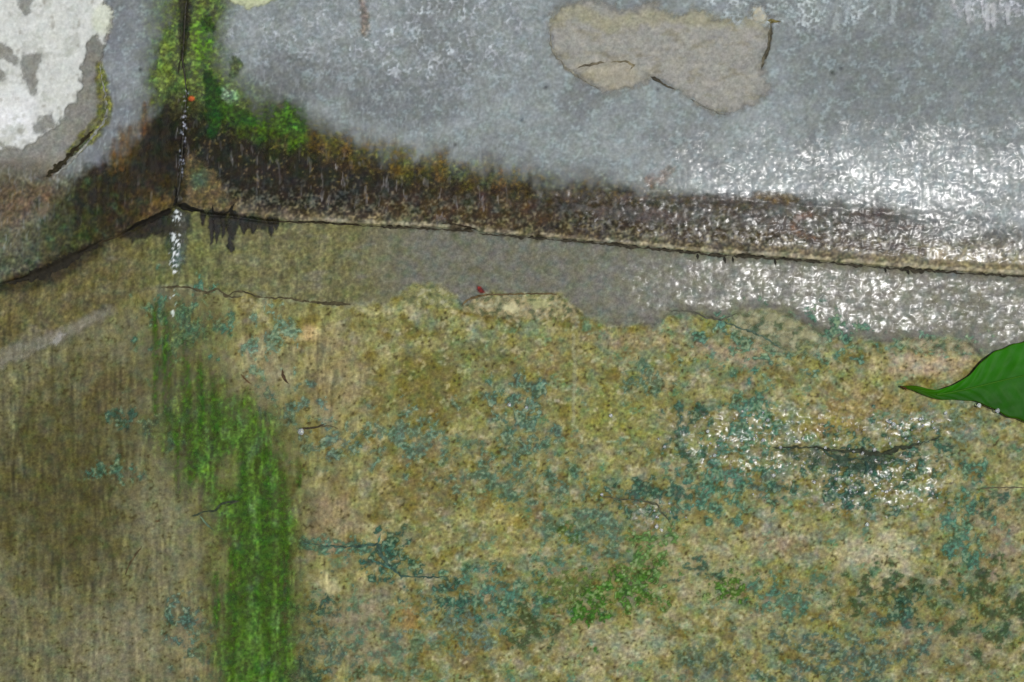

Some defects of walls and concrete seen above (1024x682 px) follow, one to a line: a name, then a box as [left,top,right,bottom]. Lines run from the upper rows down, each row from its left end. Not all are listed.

spalling [548,0,781,115]
crack [4,2,205,284]
damp [0,87,926,291]
crack [161,285,351,306]
crack [276,220,1024,277]
crack [771,436,944,474]